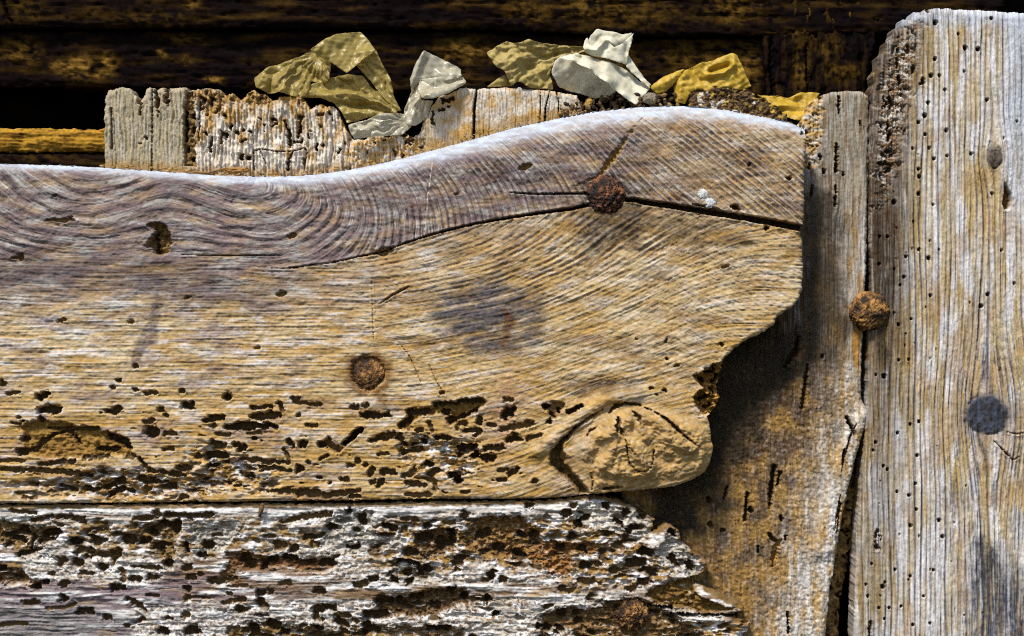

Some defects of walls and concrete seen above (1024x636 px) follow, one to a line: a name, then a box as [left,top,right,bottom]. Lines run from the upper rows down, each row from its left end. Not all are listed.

crack [290,192,589,269]
crack [623,198,802,232]
rust [347,352,390,404]